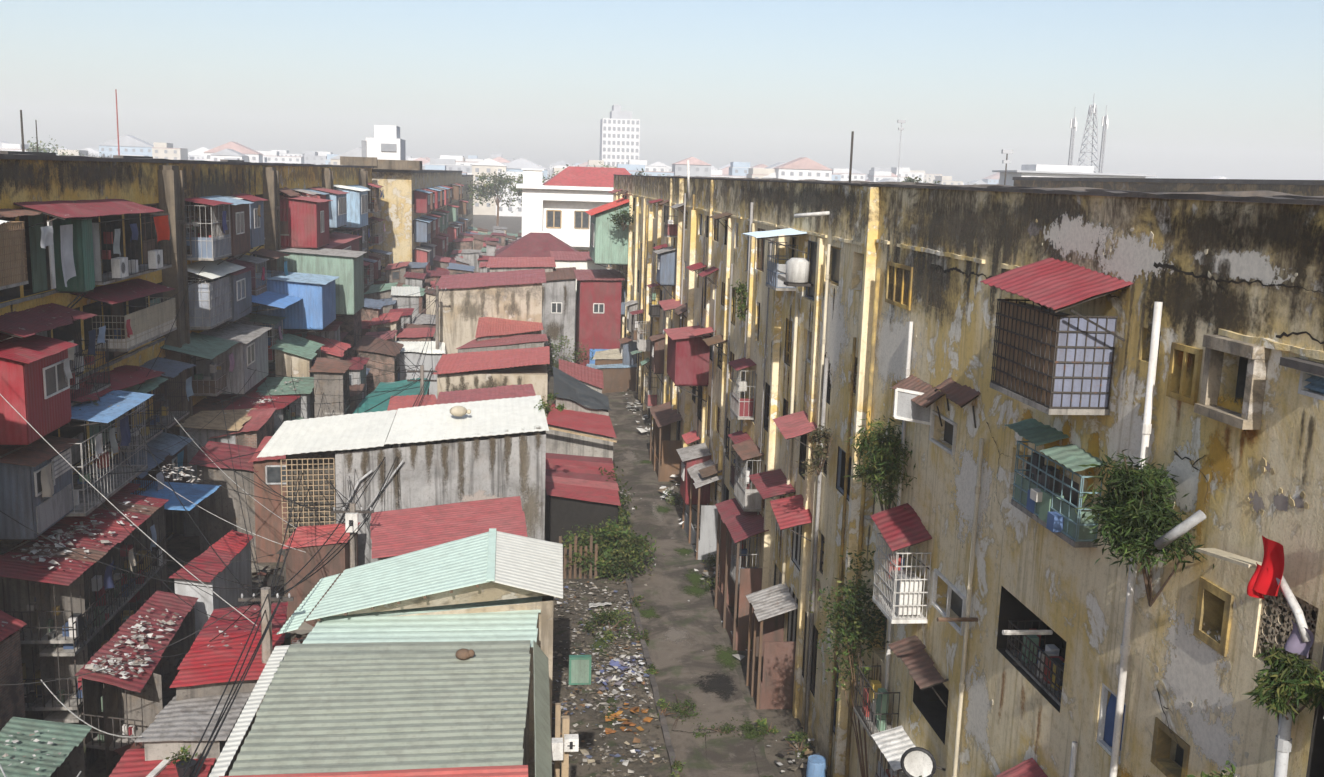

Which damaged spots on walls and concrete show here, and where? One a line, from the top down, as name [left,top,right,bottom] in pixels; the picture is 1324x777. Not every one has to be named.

leakage [0,155,142,197]
leakage [741,185,865,252]
leakage [885,195,1086,324]
flaking render [1027,212,1175,288]
leakage [1119,207,1324,384]
crack [1153,262,1323,293]
flaking render [1193,248,1298,289]
crack [1276,331,1324,344]
leakage [345,427,542,537]